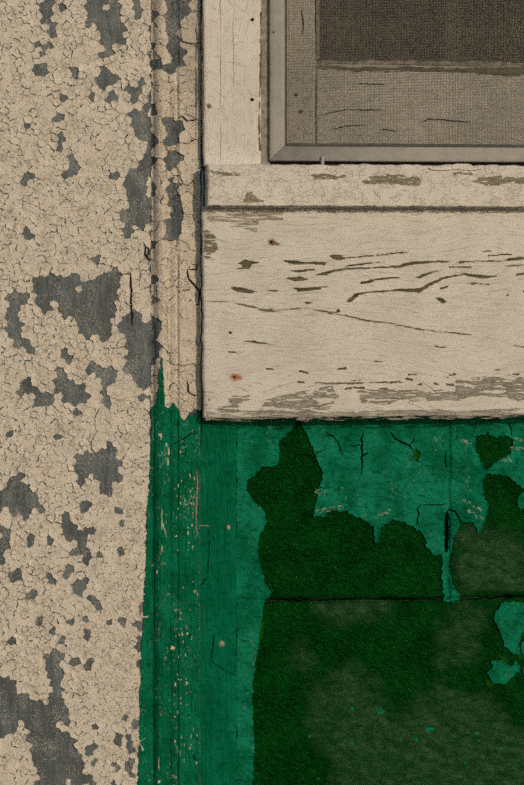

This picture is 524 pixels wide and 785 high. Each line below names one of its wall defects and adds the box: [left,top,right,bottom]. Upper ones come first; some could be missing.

spalling [32,0,67,77]
spalling [51,113,81,180]
peeling [76,0,285,259]
spalling [22,226,35,241]
peeling [0,254,198,527]
crack [316,432,370,474]
peeling [0,465,103,611]
crack [416,504,461,552]
spalling [106,602,144,668]
peeling [211,415,524,785]
peeling [0,616,98,785]
spalling [110,714,139,785]